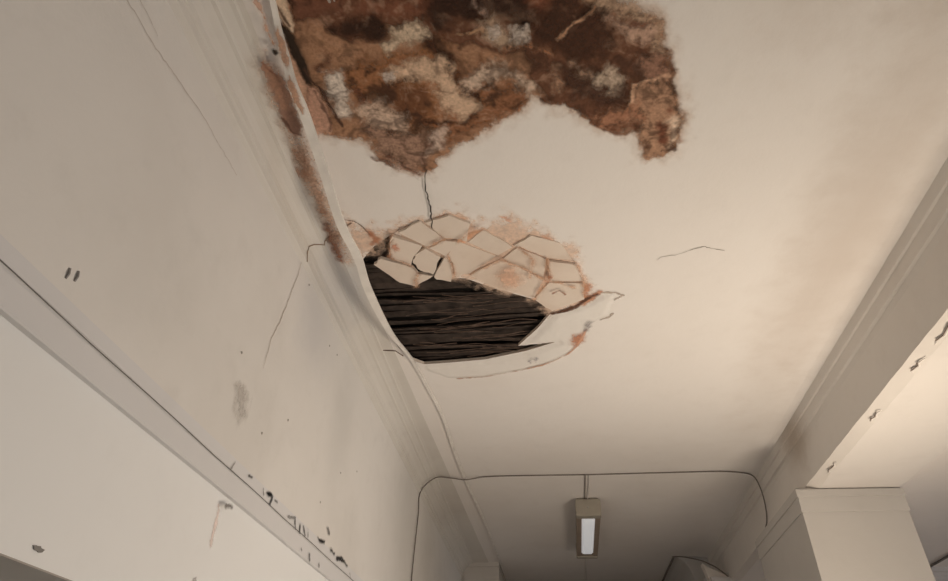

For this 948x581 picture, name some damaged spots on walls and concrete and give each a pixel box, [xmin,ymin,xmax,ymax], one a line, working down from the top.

crack [127,0,237,175]
spalling [276,0,344,135]
spalling [363,214,586,364]